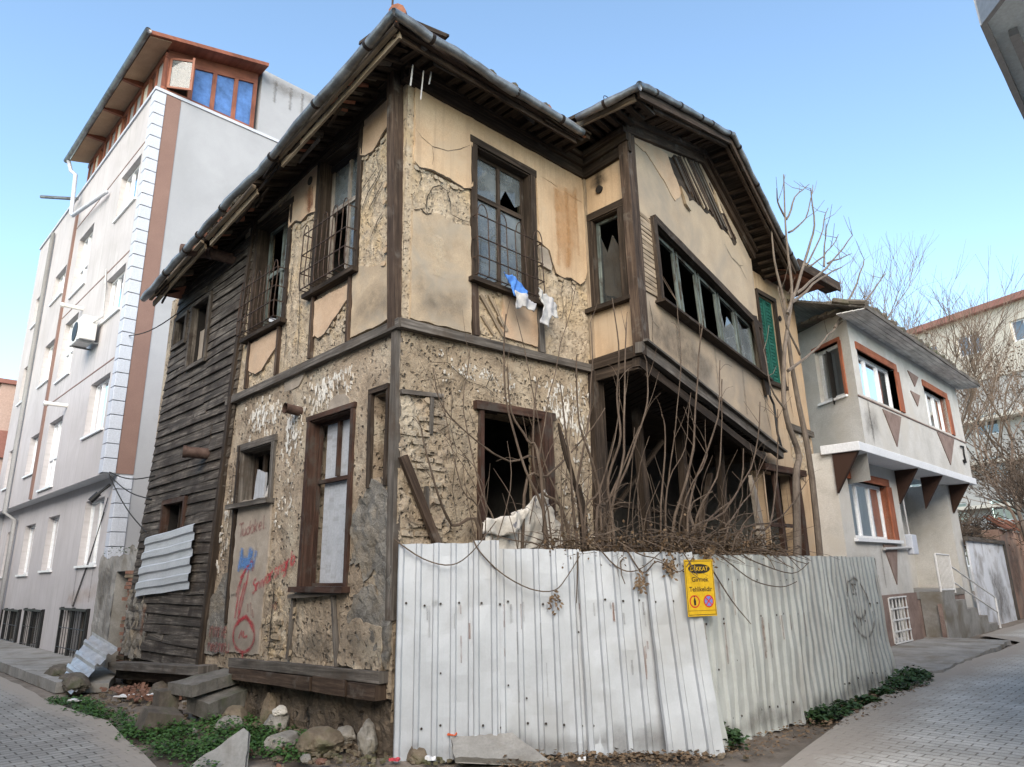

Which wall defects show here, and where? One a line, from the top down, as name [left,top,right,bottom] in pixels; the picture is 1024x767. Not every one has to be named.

flaking render [358,134,387,267]
flaking render [412,159,471,226]
crack [414,131,472,223]
flaking render [237,213,346,393]
flaking render [539,259,591,364]
flaking render [398,395,455,544]
peeling [438,349,595,547]